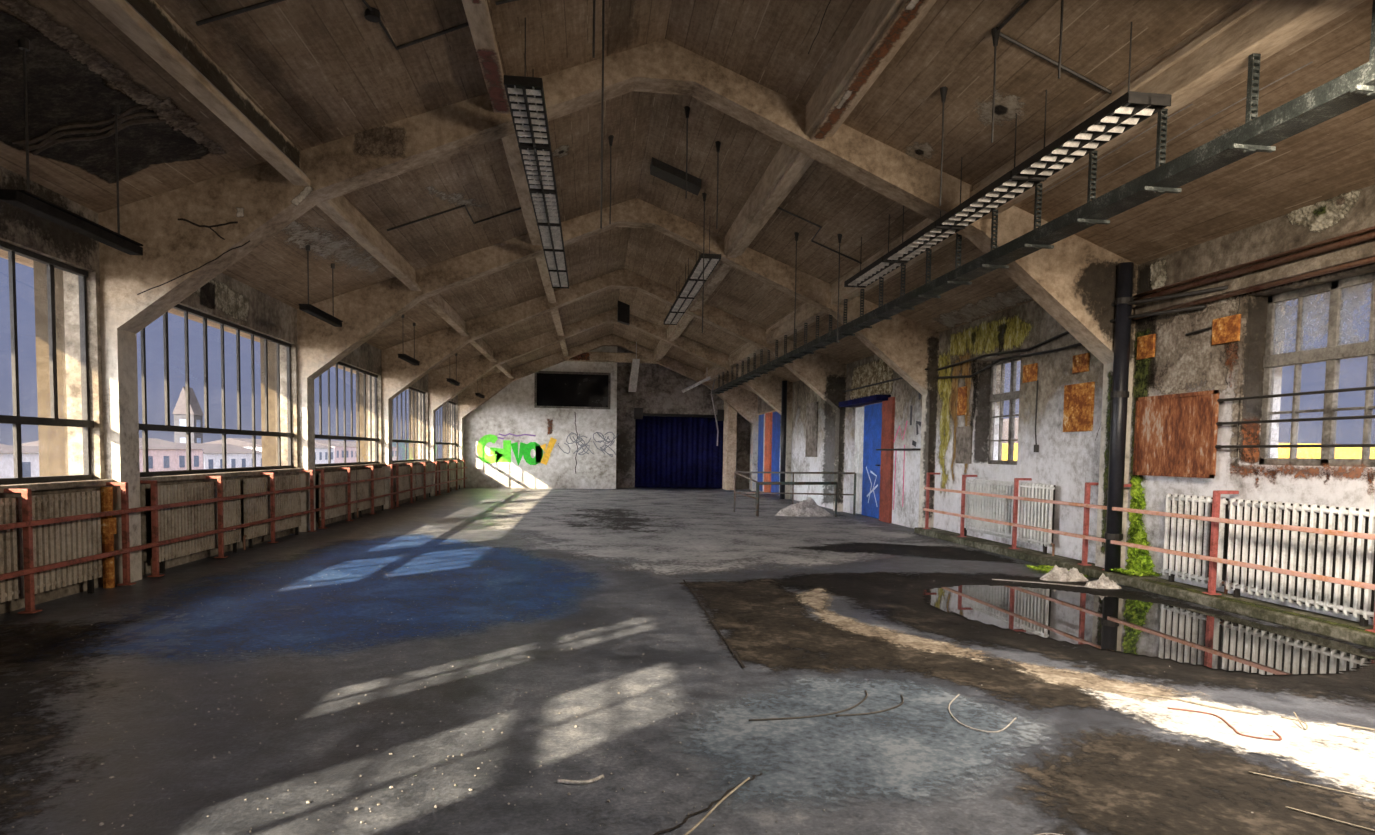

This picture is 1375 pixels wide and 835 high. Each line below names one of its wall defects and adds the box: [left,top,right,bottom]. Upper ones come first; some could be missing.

flaking render [0,0,226,183]